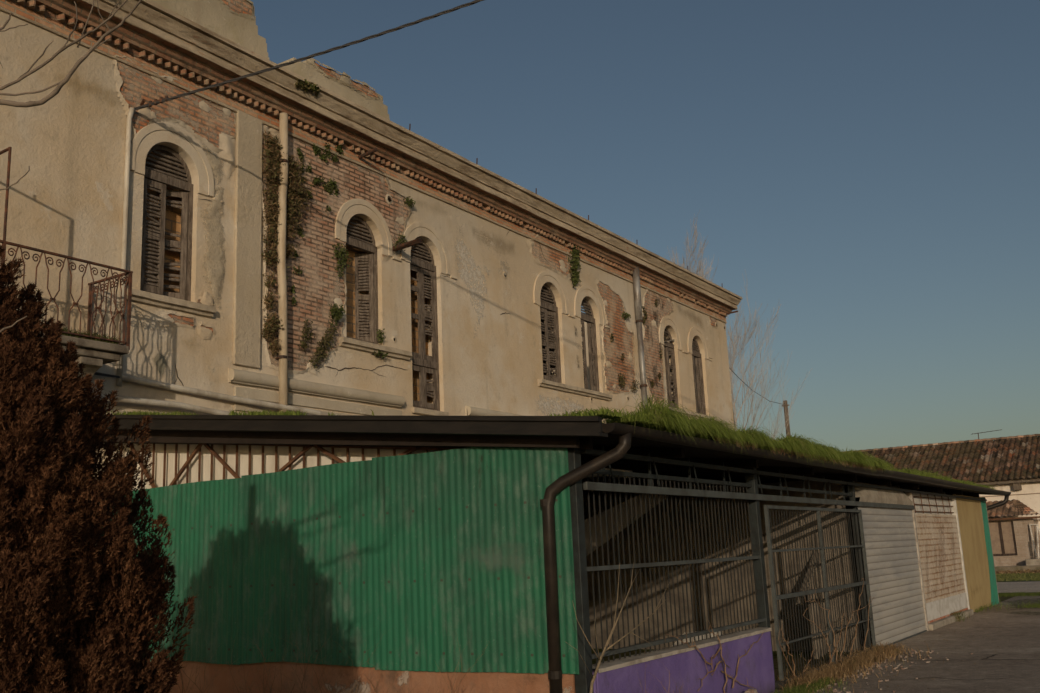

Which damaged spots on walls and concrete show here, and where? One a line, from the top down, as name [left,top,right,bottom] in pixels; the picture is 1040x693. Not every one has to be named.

flaking render [219,0,255,21]
flaking render [309,58,380,101]
flaking render [113,55,237,340]
flaking render [527,234,573,280]
flaking render [594,279,674,406]
crack [325,365,405,377]